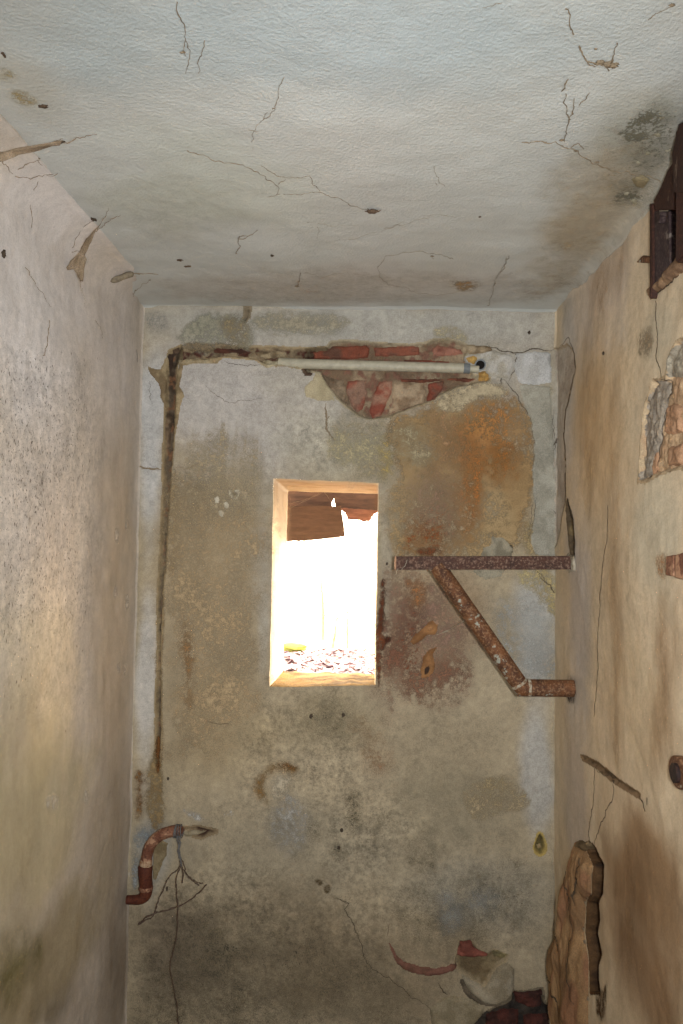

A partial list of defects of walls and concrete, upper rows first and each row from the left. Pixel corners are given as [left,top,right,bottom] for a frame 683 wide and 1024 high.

mould [618,103,673,172]
spalling [301,337,492,420]
spalling [637,337,683,485]
corrosion [386,382,535,556]
corrosion [374,569,473,711]
crack [588,768,615,846]
spalling [389,939,549,1024]